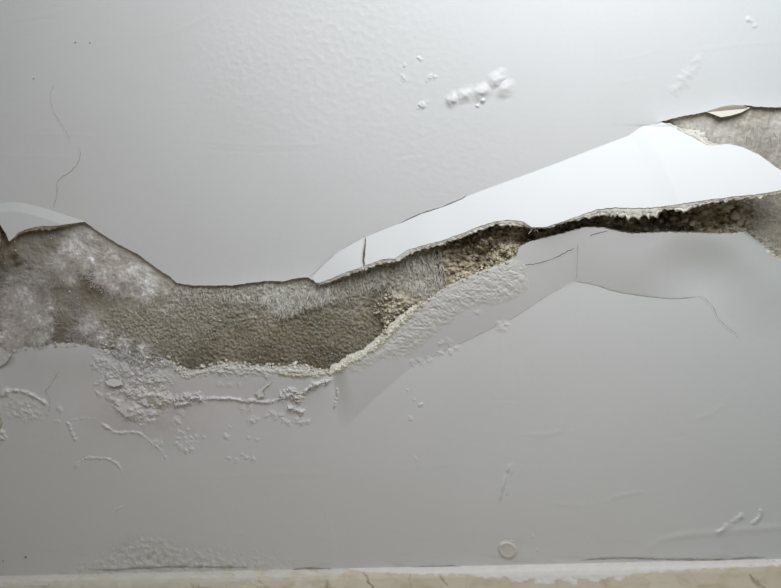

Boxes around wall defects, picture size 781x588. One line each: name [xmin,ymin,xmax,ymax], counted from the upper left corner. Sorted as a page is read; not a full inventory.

spalling [0,105,781,429]
crack [512,231,739,338]